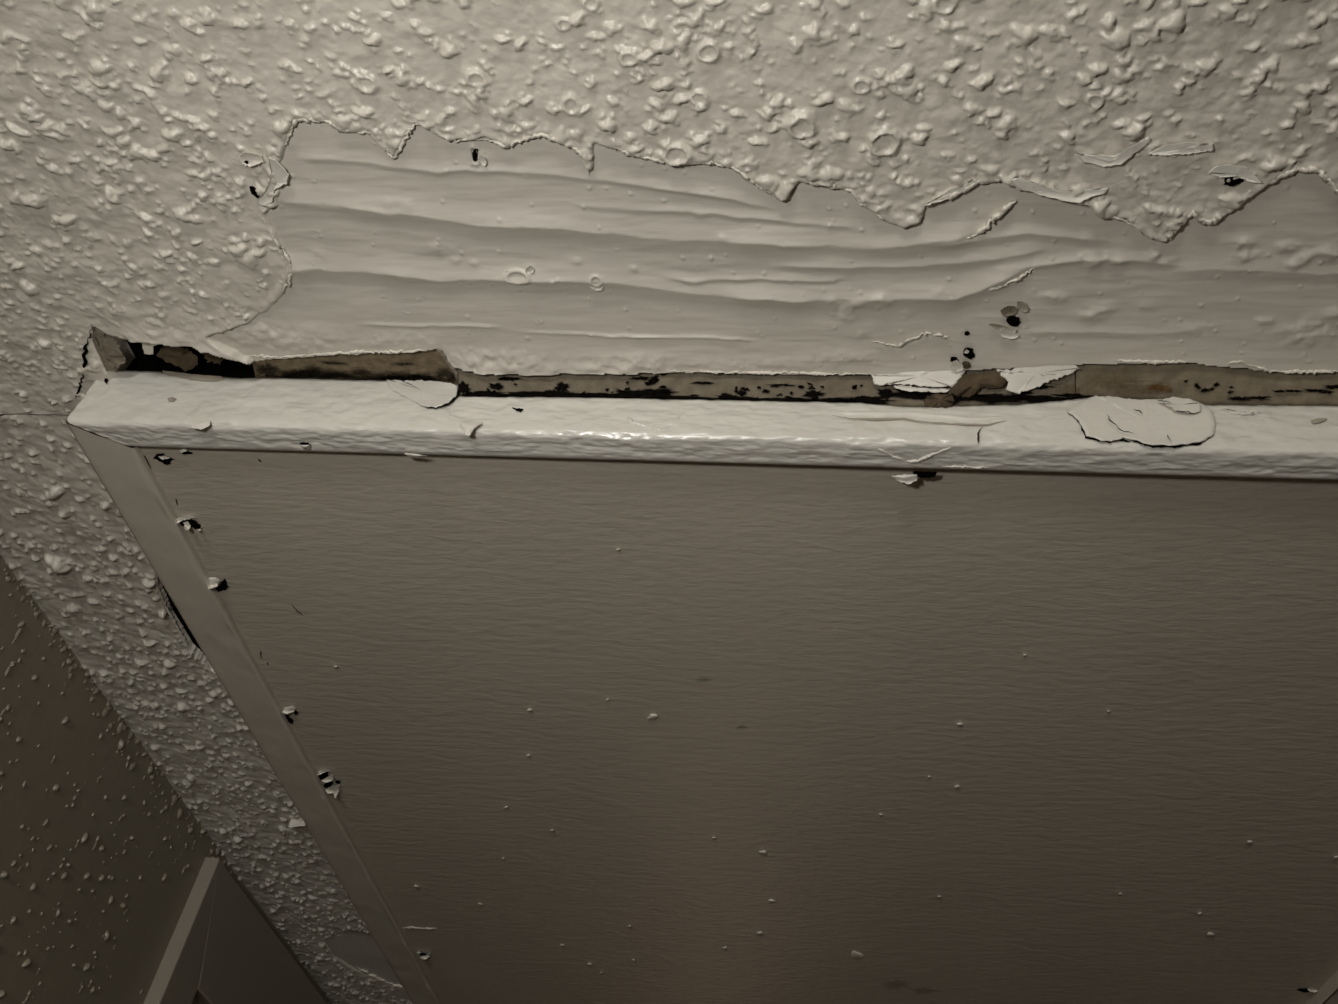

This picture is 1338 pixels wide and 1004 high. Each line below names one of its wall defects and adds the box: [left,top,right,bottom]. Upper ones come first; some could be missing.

peeling [239,152,289,206]
flaking render [472,148,487,166]
peeling [1012,178,1109,203]
peeling [1075,137,1262,183]
flaking render [988,301,1029,339]
peeling [387,379,458,408]
leakage [258,362,1091,404]
crack [75,324,1338,469]
peeling [871,331,975,393]
peeling [996,365,1080,394]
peeling [1067,395,1261,446]
crack [156,574,211,669]